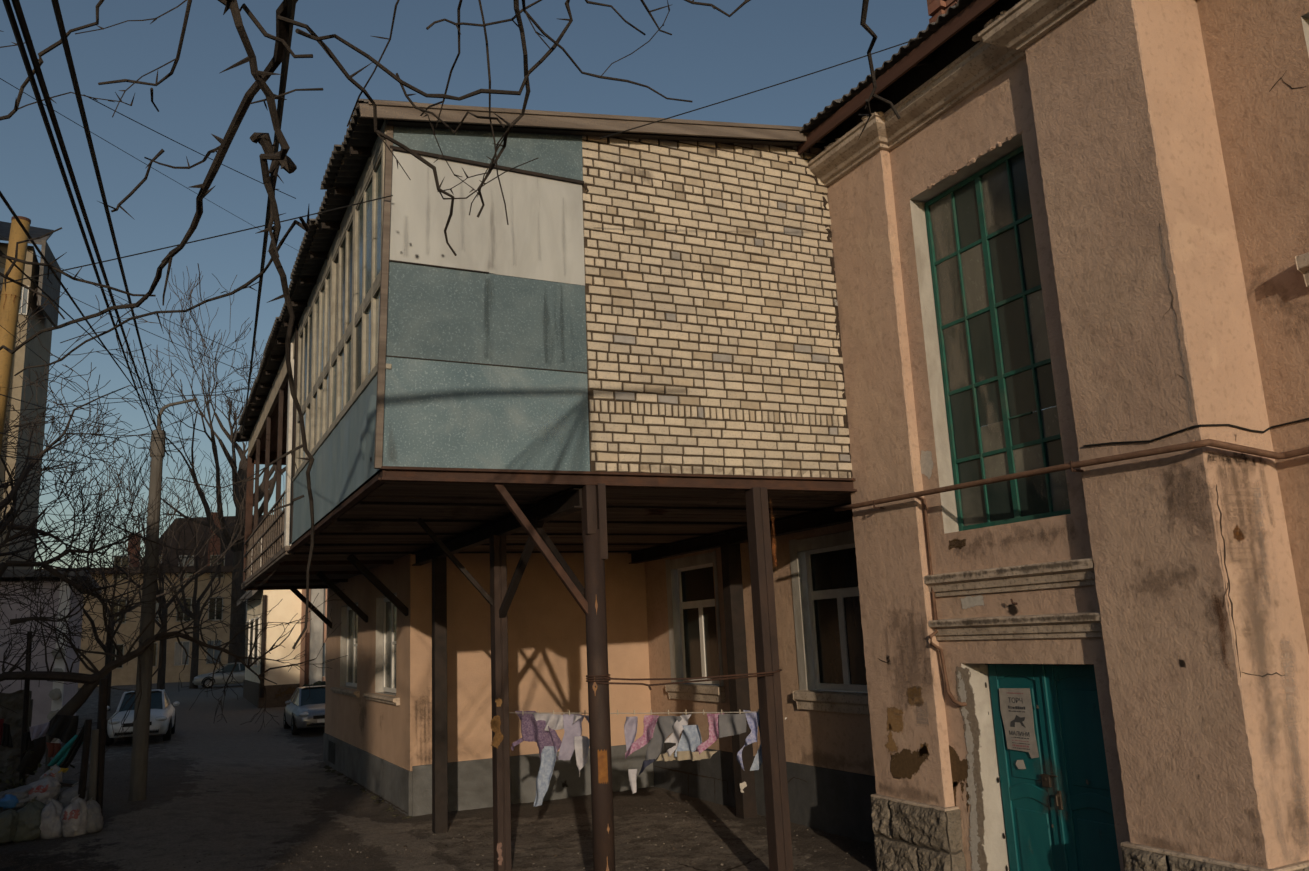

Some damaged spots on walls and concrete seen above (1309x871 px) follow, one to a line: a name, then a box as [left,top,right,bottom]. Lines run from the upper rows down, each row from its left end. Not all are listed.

crack [1159,224,1193,421]
crack [1216,484,1285,677]
rust [598,749,608,784]
peeling [885,724,929,779]
peeling [949,667,999,871]
leakage [1282,641,1309,844]